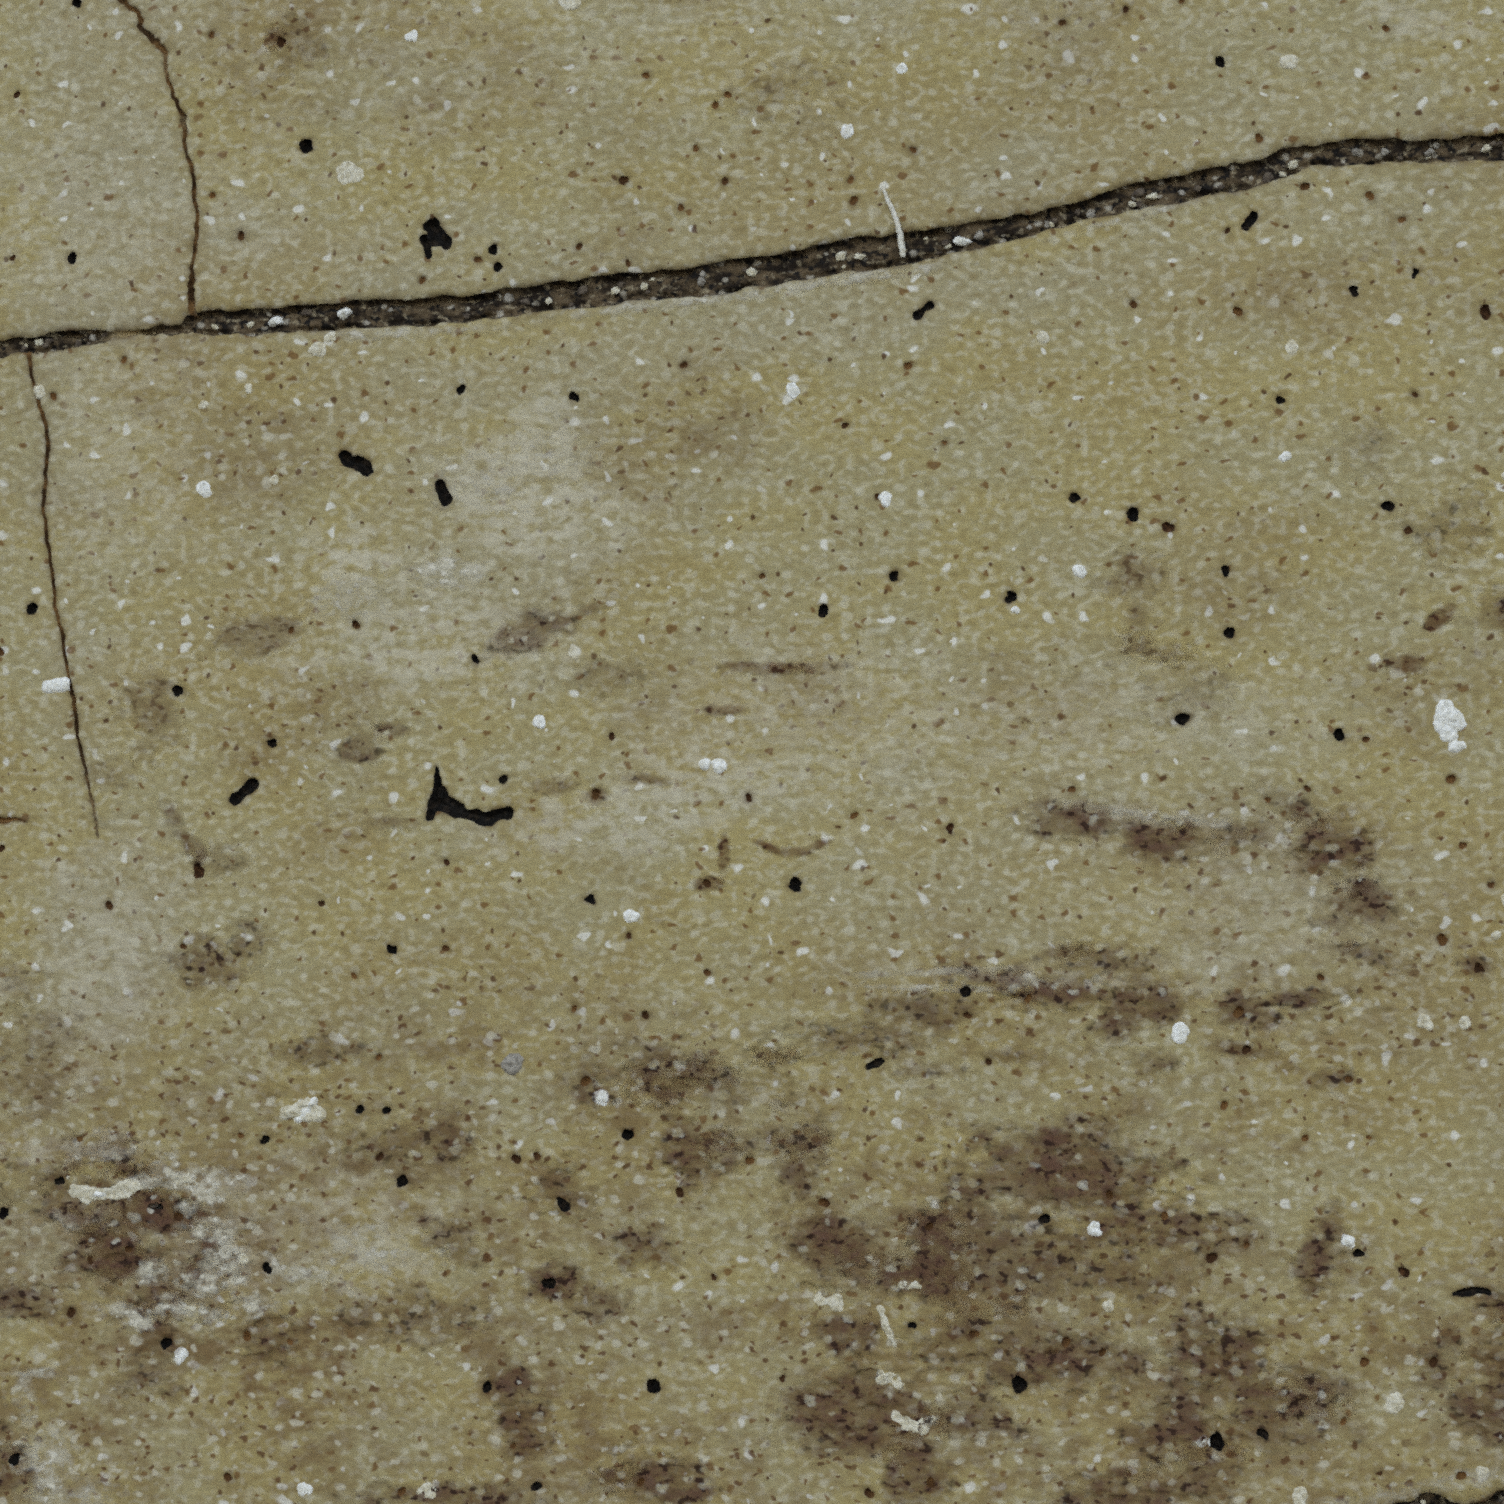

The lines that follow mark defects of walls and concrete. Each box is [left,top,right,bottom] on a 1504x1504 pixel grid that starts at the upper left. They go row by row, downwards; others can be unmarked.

crack [0,0,1504,838]
water stain [1036,801,1191,861]
water stain [1301,823,1391,922]
water stain [880,964,1176,1038]
water stain [1221,988,1323,1028]
water stain [642,1046,718,1096]
water stain [661,1132,731,1186]
water stain [789,1116,1250,1297]
water stain [1297,1211,1337,1278]
water stain [788,1316,1145,1499]
water stain [1061,1301,1348,1504]
water stain [1451,1342,1504,1443]